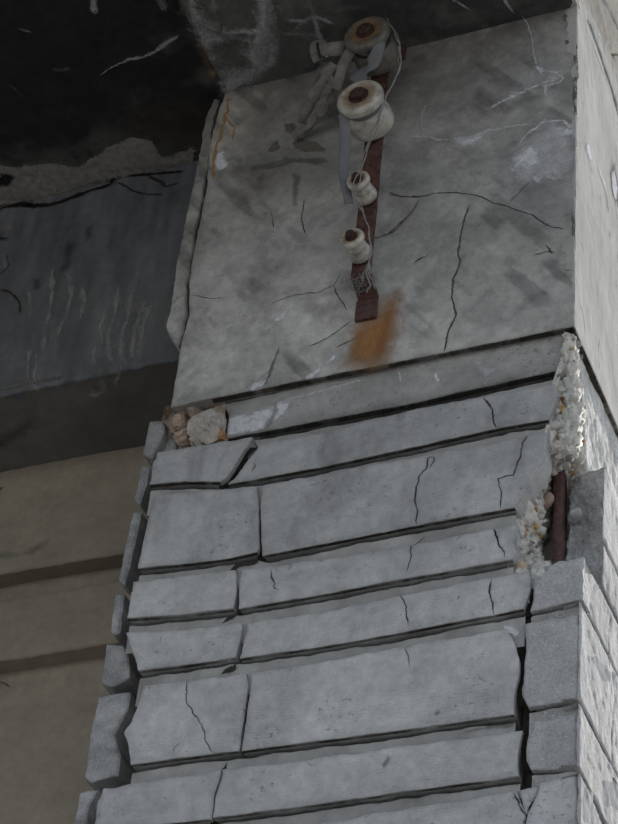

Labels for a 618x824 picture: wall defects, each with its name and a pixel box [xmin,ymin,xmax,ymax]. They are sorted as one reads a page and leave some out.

crack [99,35,179,76]
crack [588,7,618,110]
peeling [0,137,196,209]
crack [374,184,562,352]
crack [275,276,372,348]
spalling [162,402,228,449]
spalling [507,332,606,590]
crack [407,455,435,570]
crack [186,684,211,750]